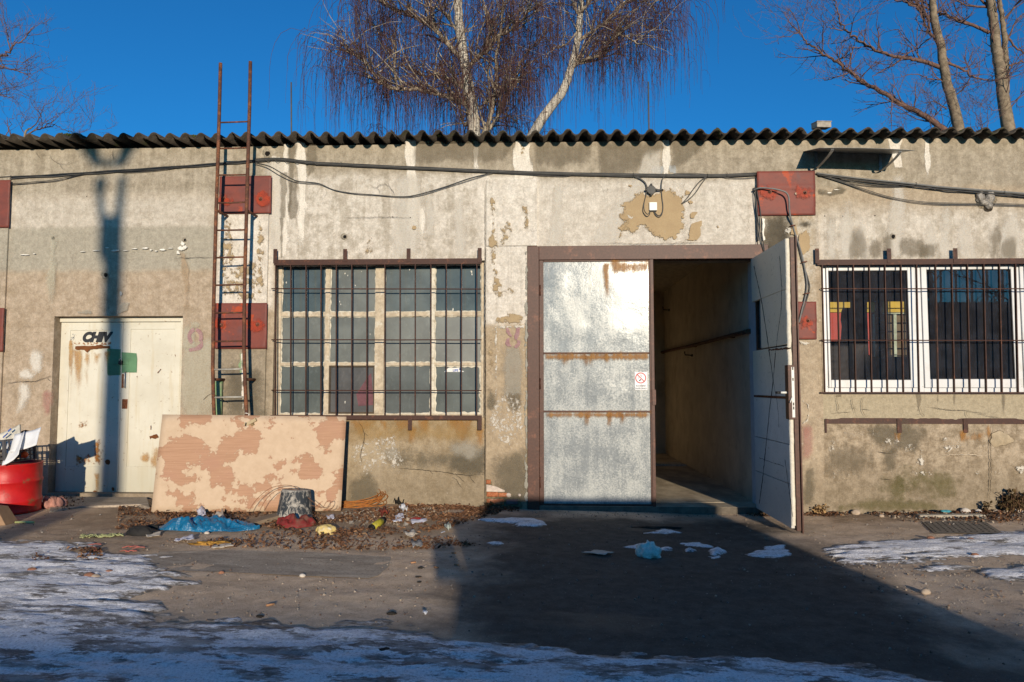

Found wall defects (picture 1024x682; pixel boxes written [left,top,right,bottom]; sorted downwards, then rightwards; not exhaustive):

efflorescence [513,141,533,179]
peeling [618,185,702,241]
peeling [219,220,264,300]
peeling [488,197,529,298]
corrosion [604,260,648,290]
corrosion [69,340,110,377]
corrosion [546,353,648,362]
corrosion [547,412,647,422]